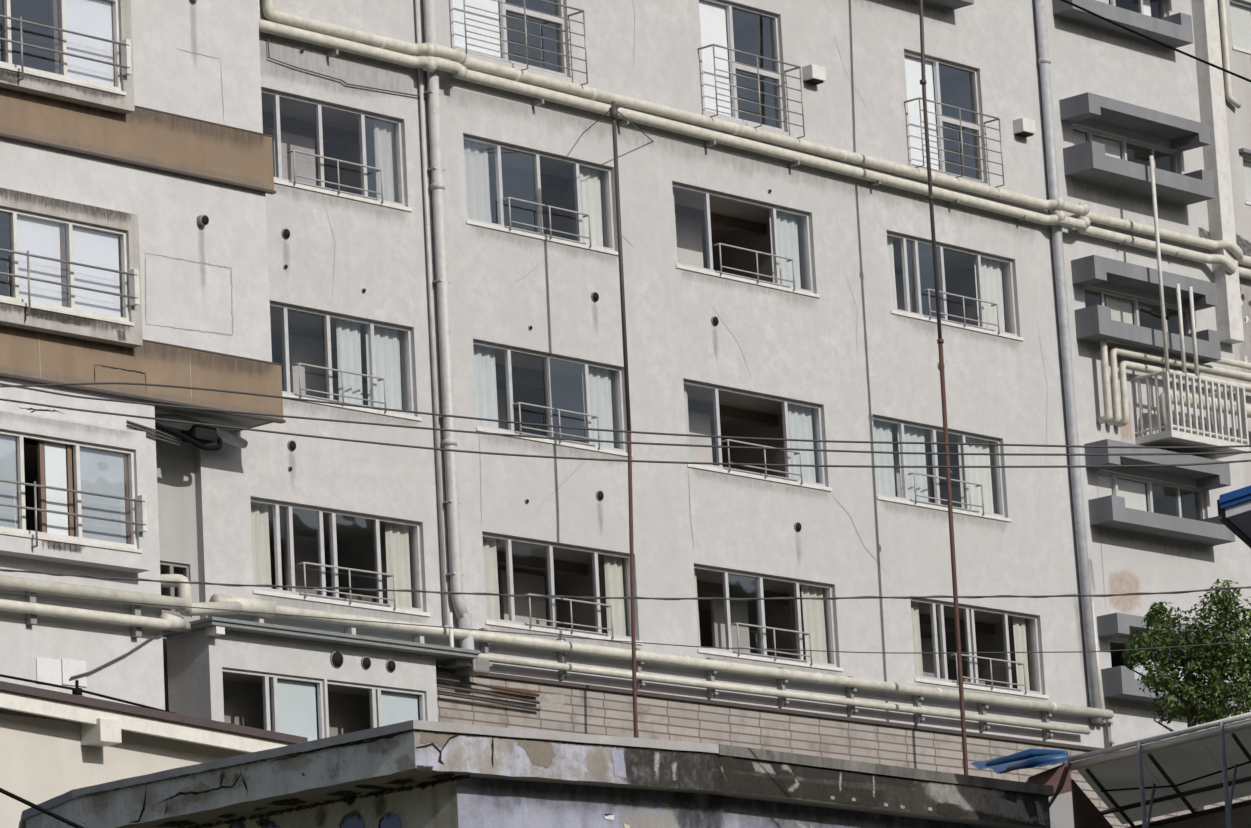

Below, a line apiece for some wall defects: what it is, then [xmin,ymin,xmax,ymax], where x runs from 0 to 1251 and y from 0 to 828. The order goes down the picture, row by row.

crack [129,768,248,823]
spalling [154,765,470,828]
crack [274,733,494,764]
damp [77,729,970,828]
peeling [518,739,563,768]